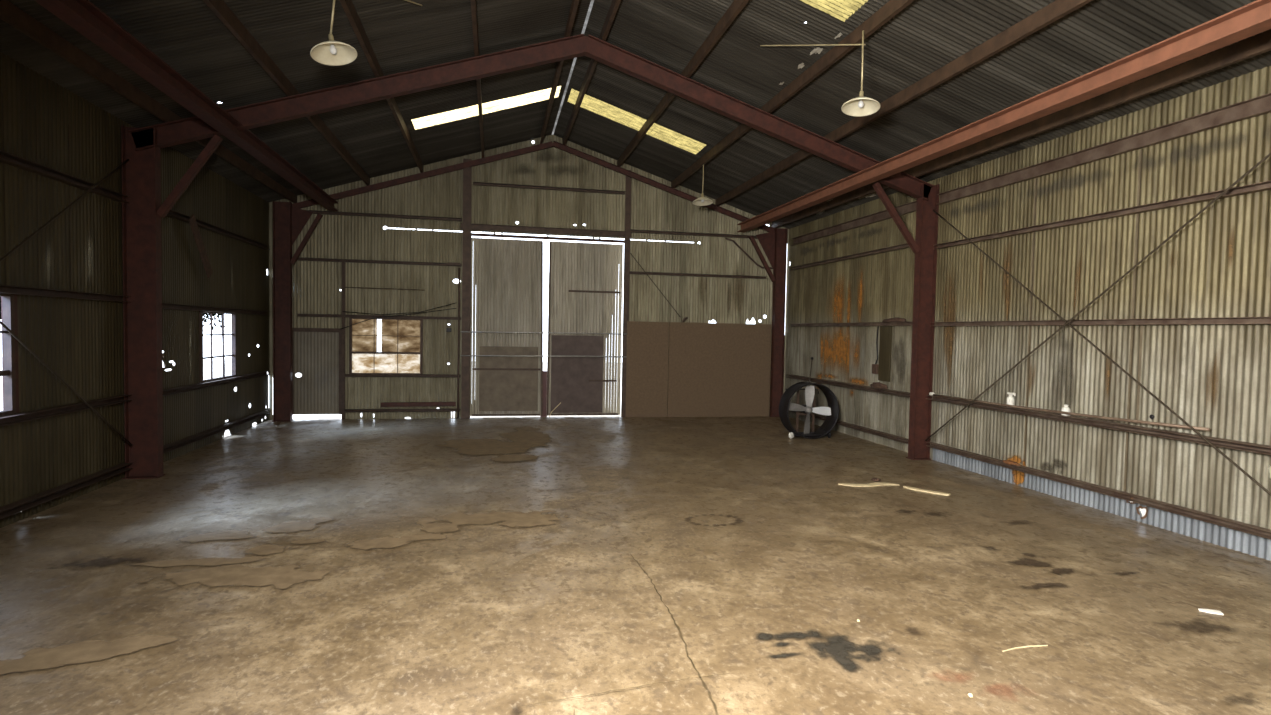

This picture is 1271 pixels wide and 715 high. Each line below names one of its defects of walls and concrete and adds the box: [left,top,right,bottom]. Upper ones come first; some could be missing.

corrosion [817,274,865,396]
corrosion [1002,455,1026,485]
crack [630,553,729,711]
water stain [770,642,800,658]